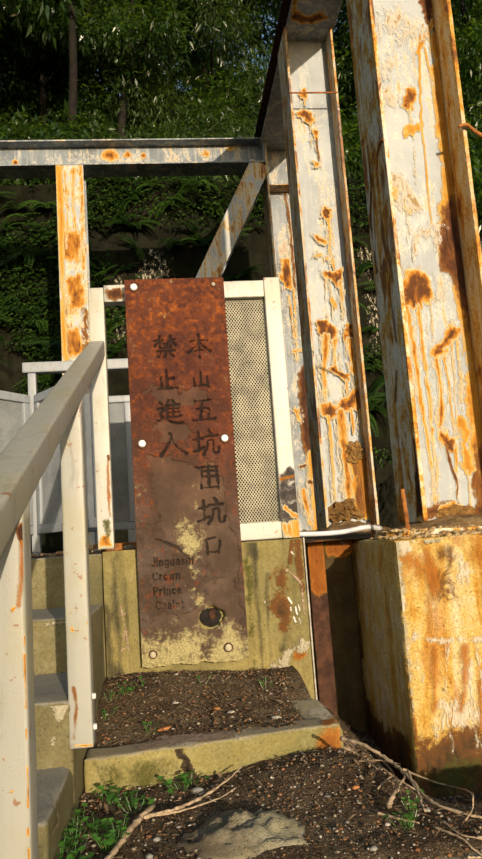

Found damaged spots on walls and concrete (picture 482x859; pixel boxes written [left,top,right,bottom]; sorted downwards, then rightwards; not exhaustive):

rust [94,147,147,162]
rust [294,87,322,170]
rust [56,165,89,361]
rust [400,0,482,519]
rust [311,204,371,521]
rust [268,192,327,632]
rust [10,523,24,612]
rust [399,550,441,612]
damp [363,632,482,797]
rust [459,644,469,711]
crack [175,749,199,778]